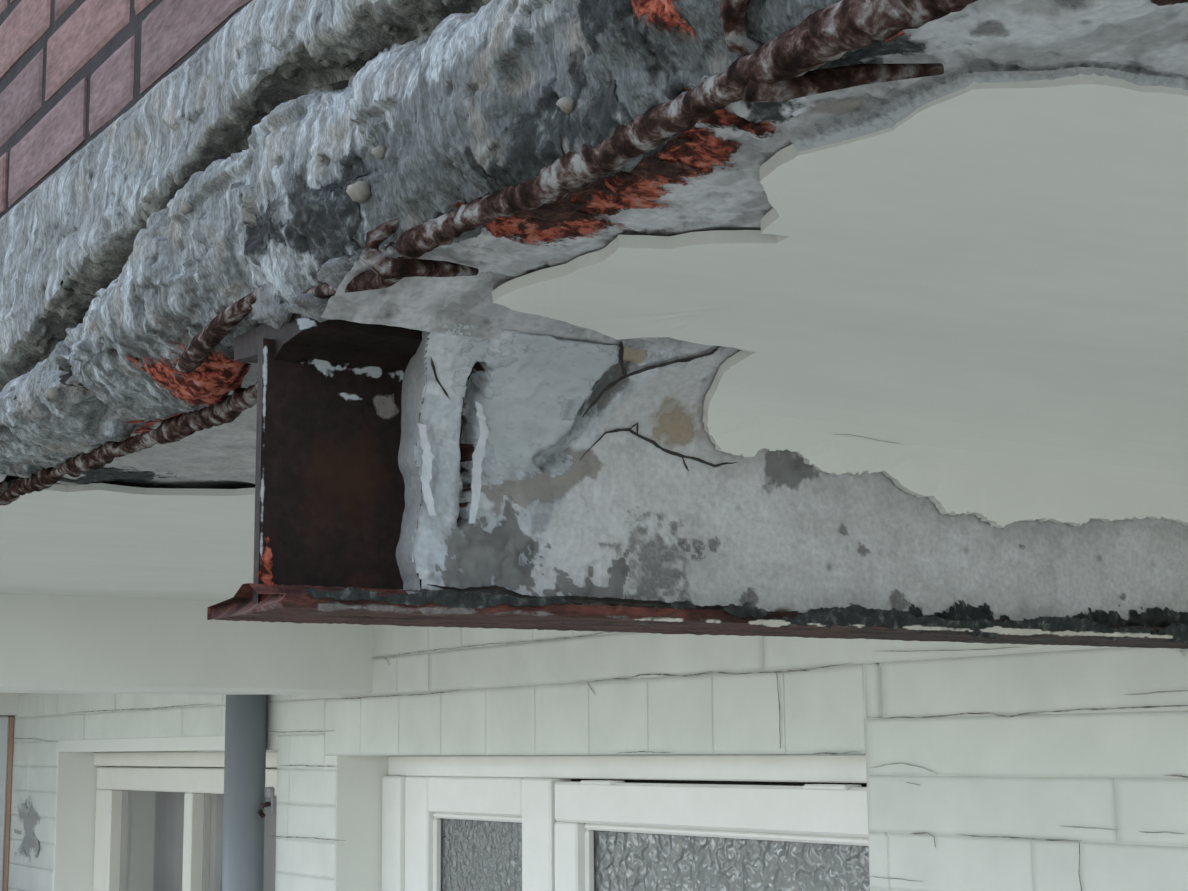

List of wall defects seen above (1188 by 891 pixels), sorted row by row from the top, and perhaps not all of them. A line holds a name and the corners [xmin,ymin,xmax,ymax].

corrosion [482,108,776,246]
spalling [0,0,1188,621]
corrosion [125,342,252,438]
corrosion [457,361,484,522]
damp [436,347,646,606]
crack [580,341,737,471]
damp [765,449,818,489]
corrosion [305,586,566,616]
corrosion [723,602,1188,644]
crack [873,690,1188,719]
crack [813,751,938,785]
crack [910,826,1184,891]